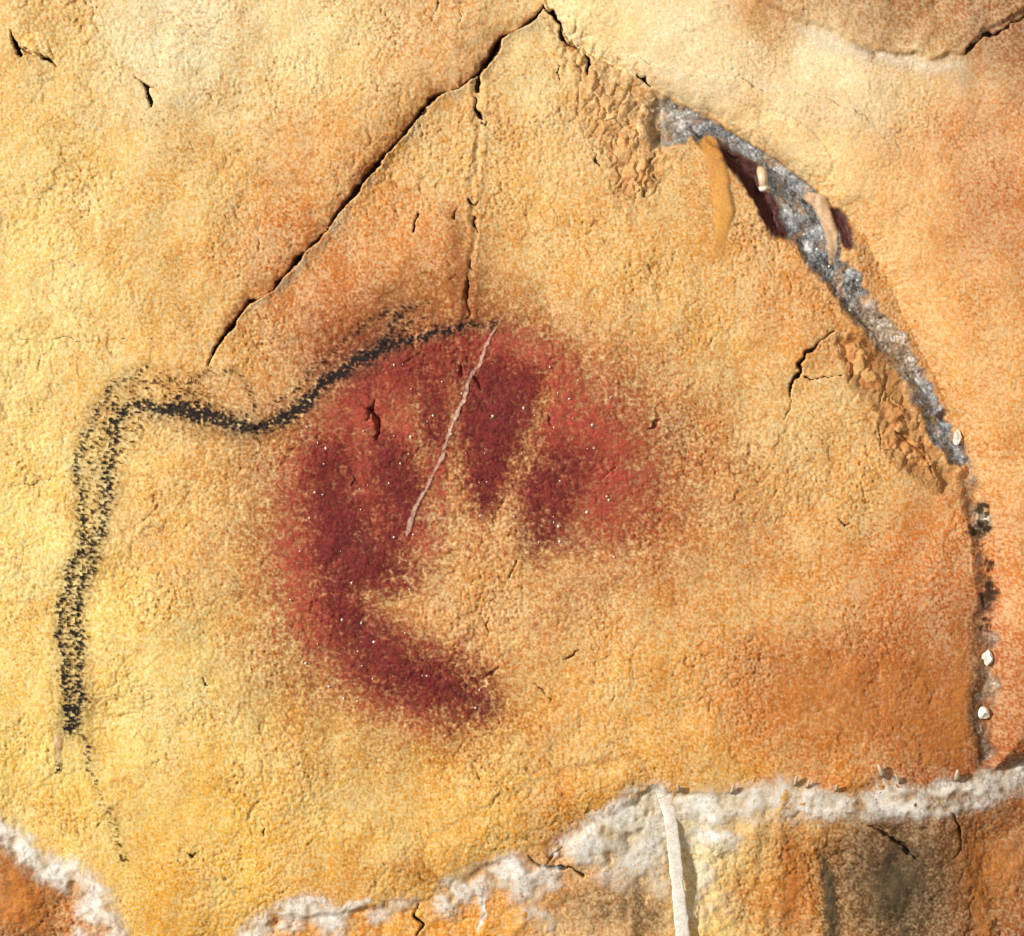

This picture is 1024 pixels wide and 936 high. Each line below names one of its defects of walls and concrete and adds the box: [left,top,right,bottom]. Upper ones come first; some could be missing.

crack [208,6,591,363]
crack [593,121,658,197]
crack [786,331,853,416]
damp [0,819,126,936]
damp [239,897,418,936]
damp [434,762,1024,936]